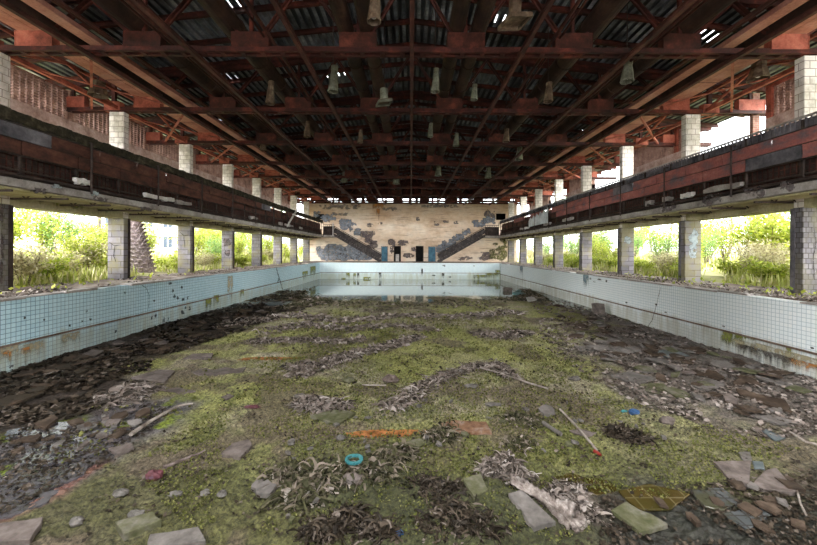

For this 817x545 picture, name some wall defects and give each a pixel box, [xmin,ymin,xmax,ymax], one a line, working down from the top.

peeling [313,211,382,261]
peeling [434,209,496,253]
peeling [458,252,492,261]
peeling [688,228,699,258]
water stain [724,335,817,368]